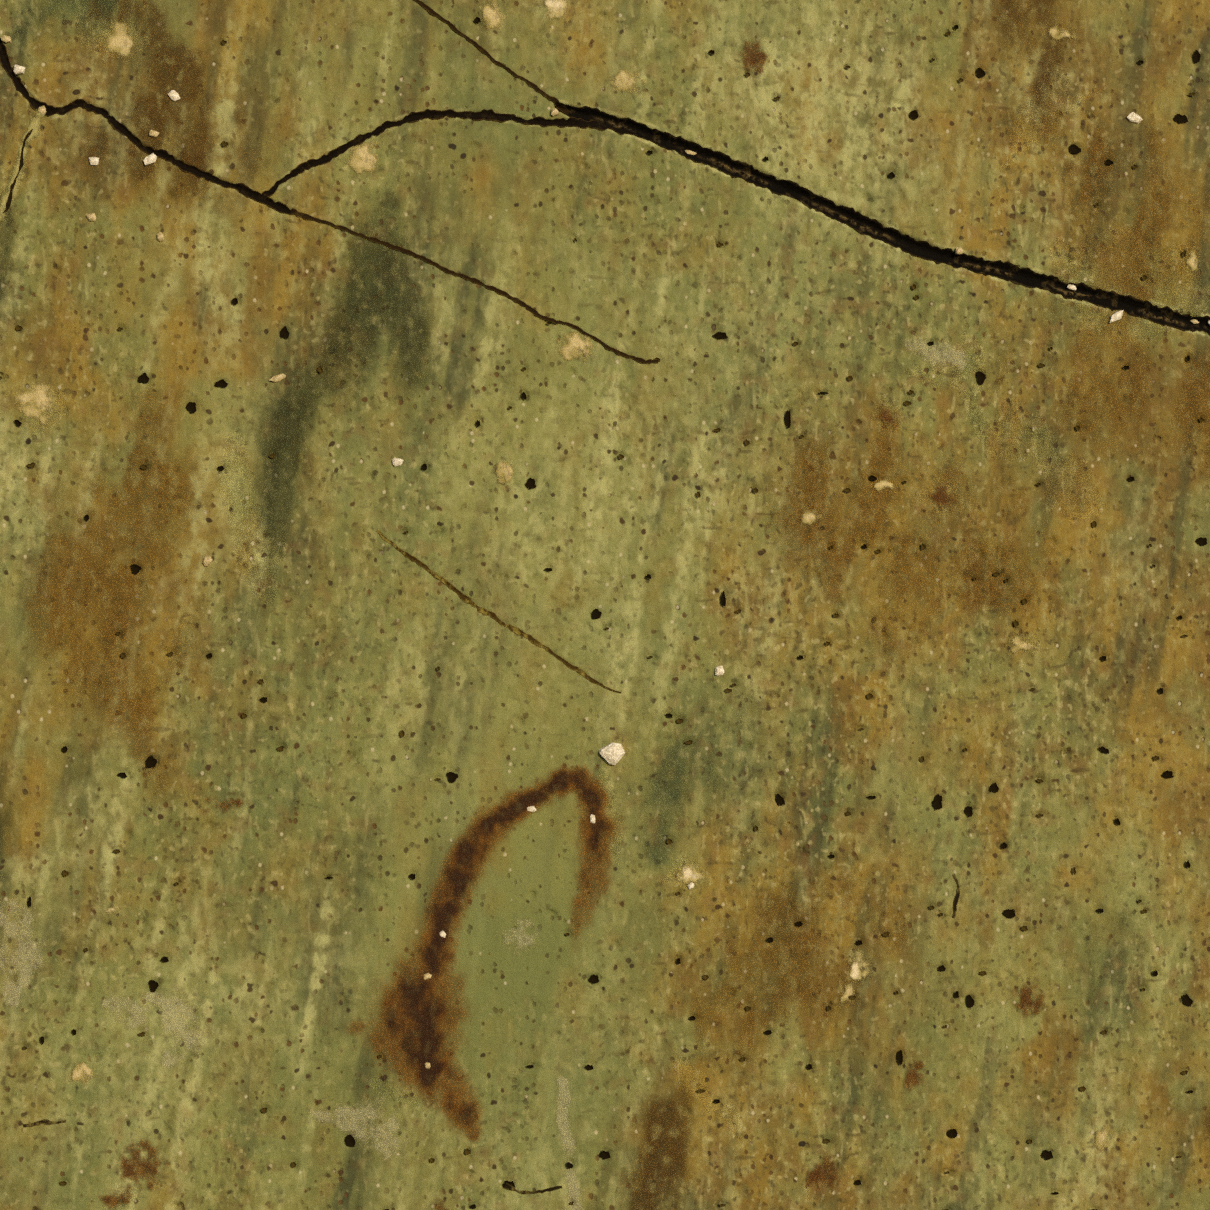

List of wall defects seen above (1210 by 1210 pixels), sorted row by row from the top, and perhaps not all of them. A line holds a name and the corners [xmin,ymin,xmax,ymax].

crack [0,0,1210,364]
crack [377,530,621,693]
rust [374,767,614,1140]